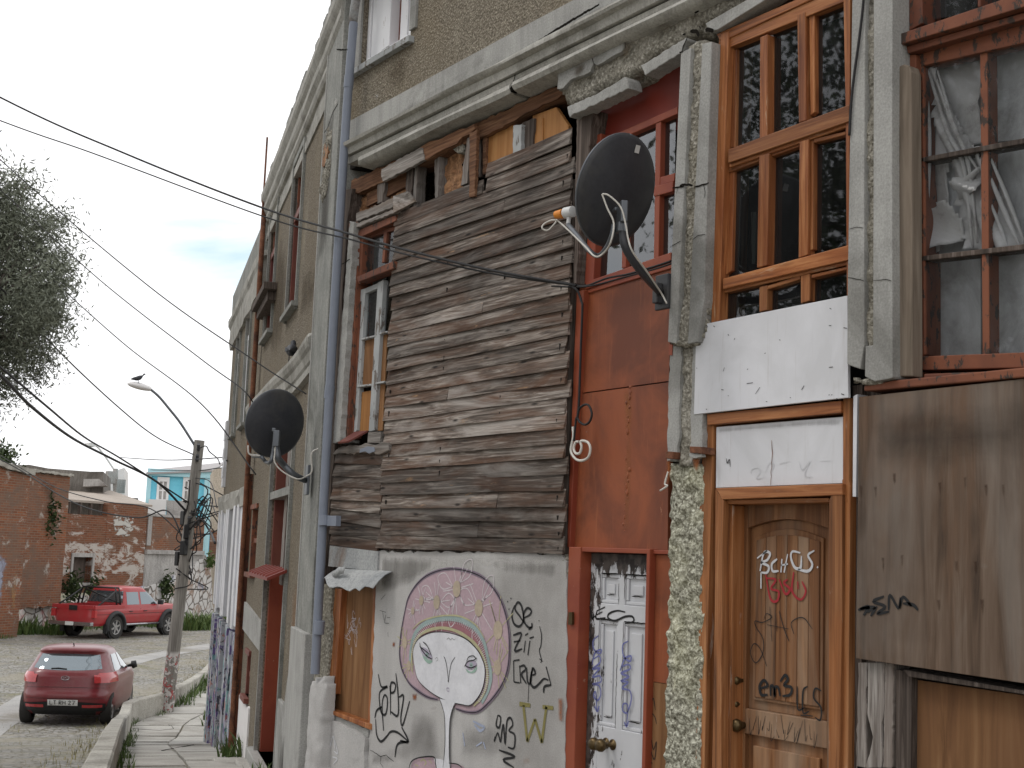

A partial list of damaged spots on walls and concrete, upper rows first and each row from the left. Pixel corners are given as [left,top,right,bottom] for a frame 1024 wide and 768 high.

crack [673,182,709,197]
peeling [113,516,133,536]